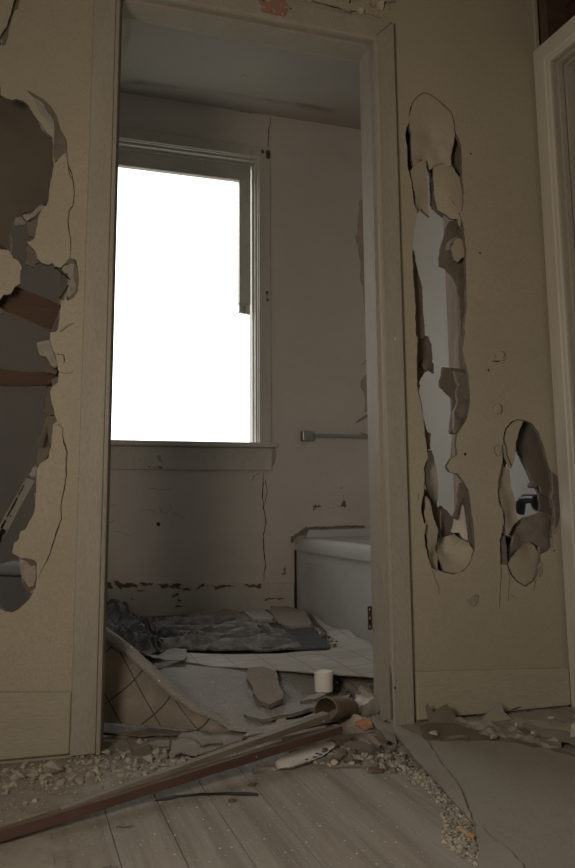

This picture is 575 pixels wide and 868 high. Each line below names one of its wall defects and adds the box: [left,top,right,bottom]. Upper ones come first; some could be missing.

spalling [0,0,20,45]
spalling [27,90,67,163]
spalling [0,205,45,269]
spalling [405,93,465,335]
spalling [60,258,79,307]
spalling [0,323,73,542]
spalling [412,250,473,573]
crack [252,472,267,572]
spalling [498,420,560,586]
spalling [19,558,37,591]
peeling [107,580,262,608]